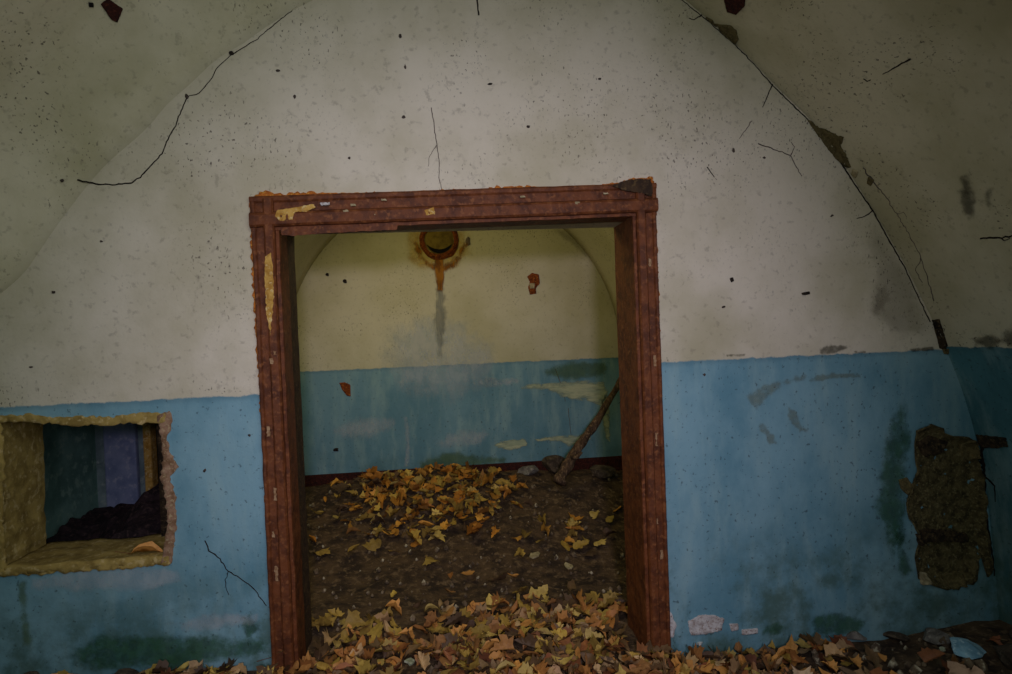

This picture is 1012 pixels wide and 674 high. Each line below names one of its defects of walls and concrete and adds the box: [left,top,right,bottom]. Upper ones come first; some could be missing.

crack [77,7,296,186]
crack [682,0,809,176]
crack [428,107,442,189]
crack [840,163,934,322]
crack [980,234,1012,242]
rust [414,243,467,344]
spalling [899,424,1008,590]
crack [205,541,267,606]
peeling [670,612,758,638]